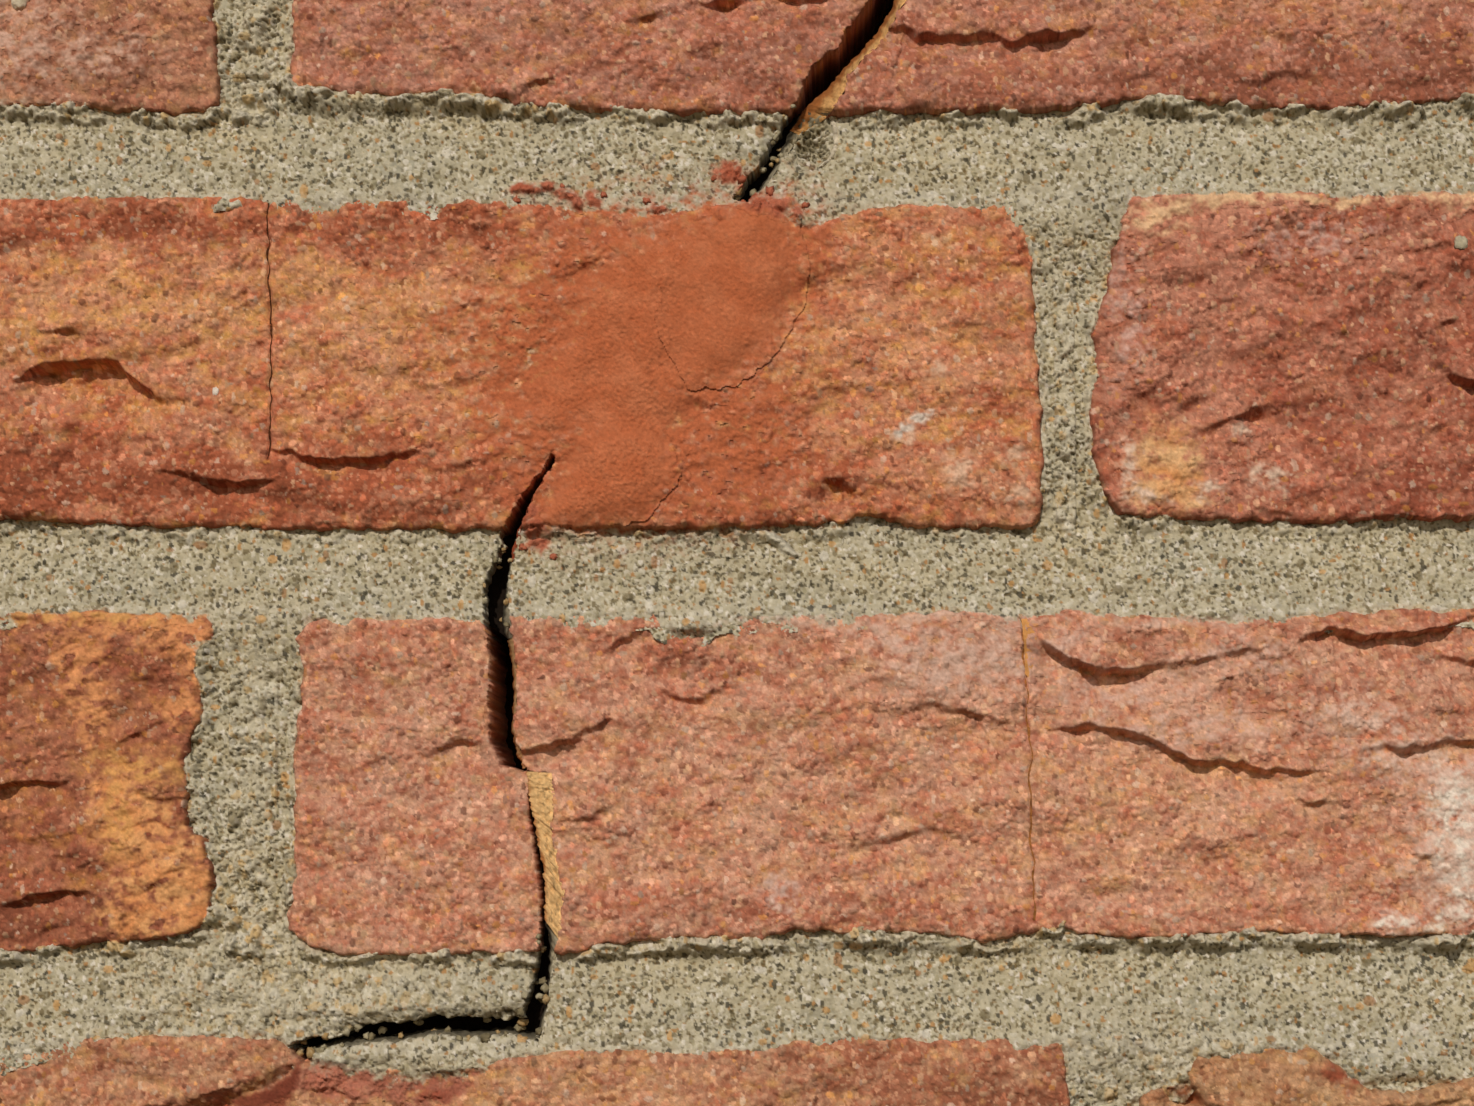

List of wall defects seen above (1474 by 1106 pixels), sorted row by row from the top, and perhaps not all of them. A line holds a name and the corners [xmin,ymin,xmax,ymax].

crack [734,0,906,202]
crack [265,200,273,459]
crack [296,461,565,1059]